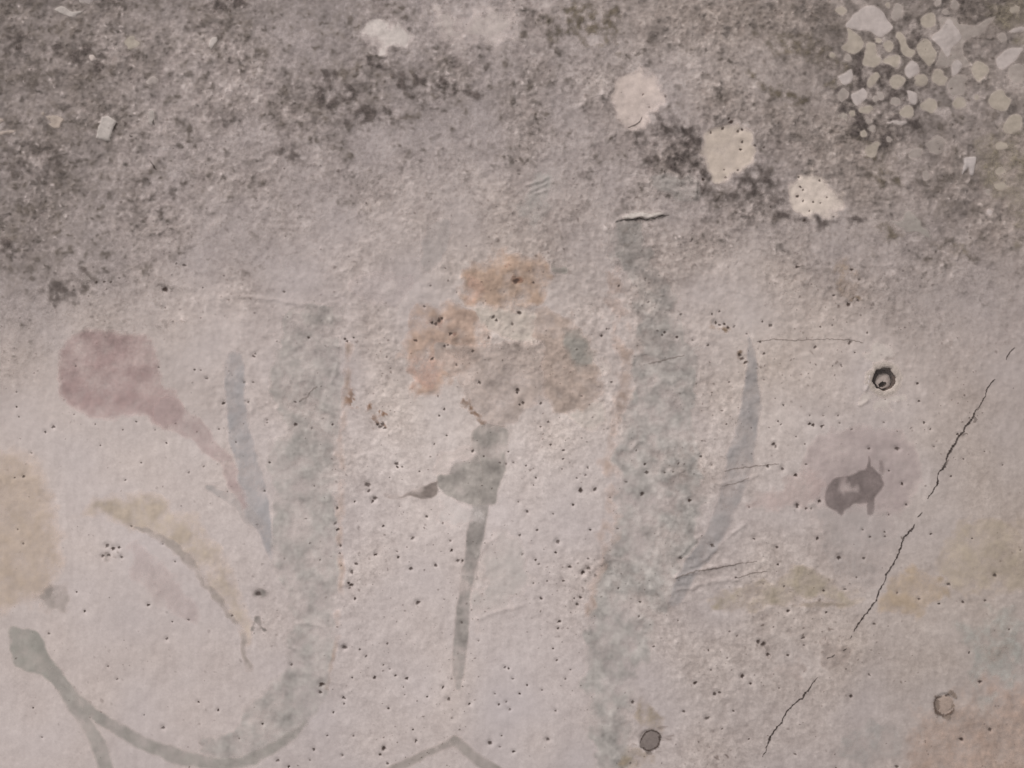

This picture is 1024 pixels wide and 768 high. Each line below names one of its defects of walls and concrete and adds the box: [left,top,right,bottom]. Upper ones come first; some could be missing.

peeling [362,19,412,56]
spalling [611,69,666,130]
peeling [830,0,1024,159]
leakage [0,0,1024,375]
spalling [701,117,765,183]
spalling [789,175,843,221]
peeling [962,157,976,175]
crack [762,348,1014,757]